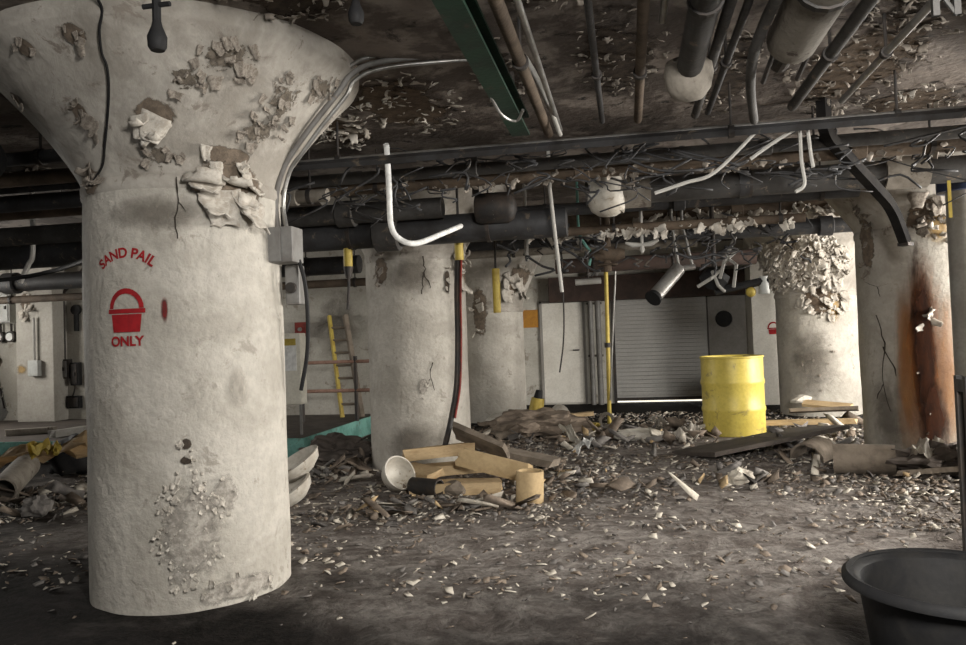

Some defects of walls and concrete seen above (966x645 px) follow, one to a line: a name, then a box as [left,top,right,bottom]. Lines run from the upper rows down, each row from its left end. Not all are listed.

peeling [11,37,36,58]
peeling [61,22,86,58]
peeling [67,97,99,146]
peeling [127,36,340,235]
peeling [315,72,465,151]
peeling [782,0,966,118]
peeling [749,205,874,322]
corrosion [901,247,954,443]
spalling [150,439,273,604]